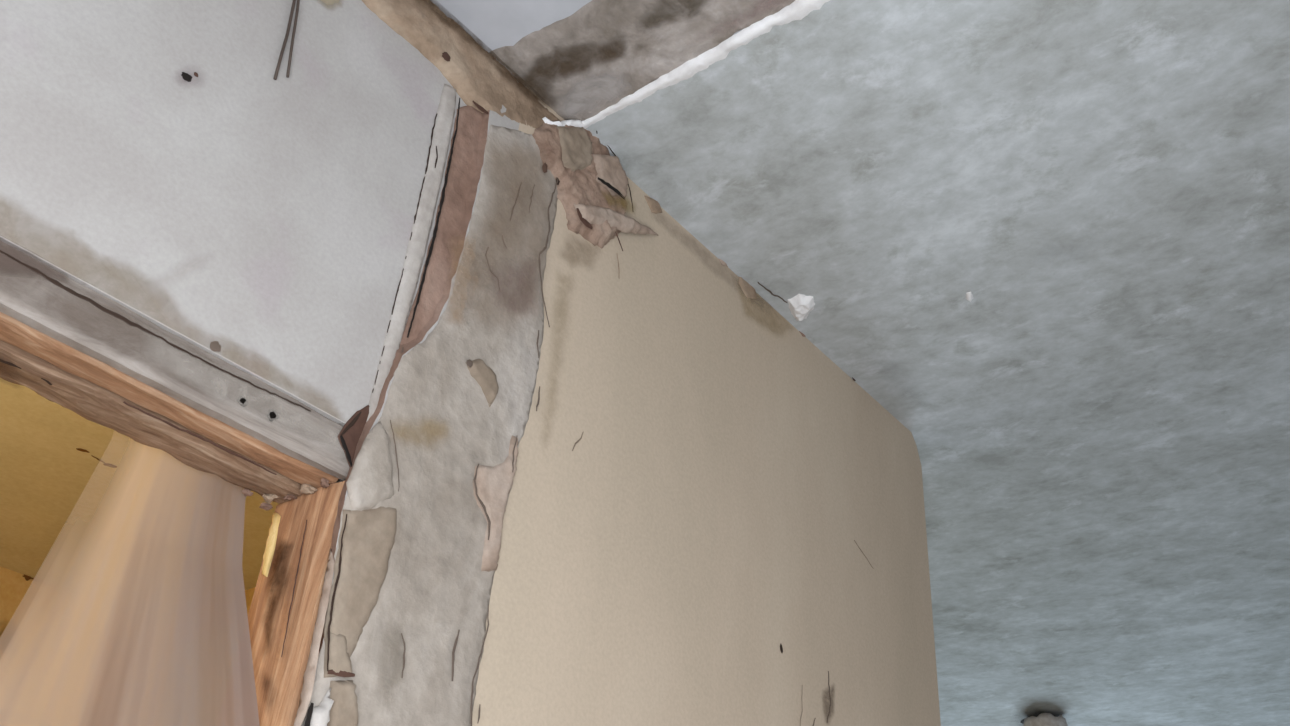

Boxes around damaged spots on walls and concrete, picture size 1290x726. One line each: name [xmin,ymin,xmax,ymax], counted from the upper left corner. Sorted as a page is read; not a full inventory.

water stain [644,0,704,27]
water stain [521,41,623,114]
flaking render [362,0,795,270]
spalling [465,359,499,408]
peeling [337,405,394,510]
spalling [472,435,518,572]
spalling [304,631,358,726]